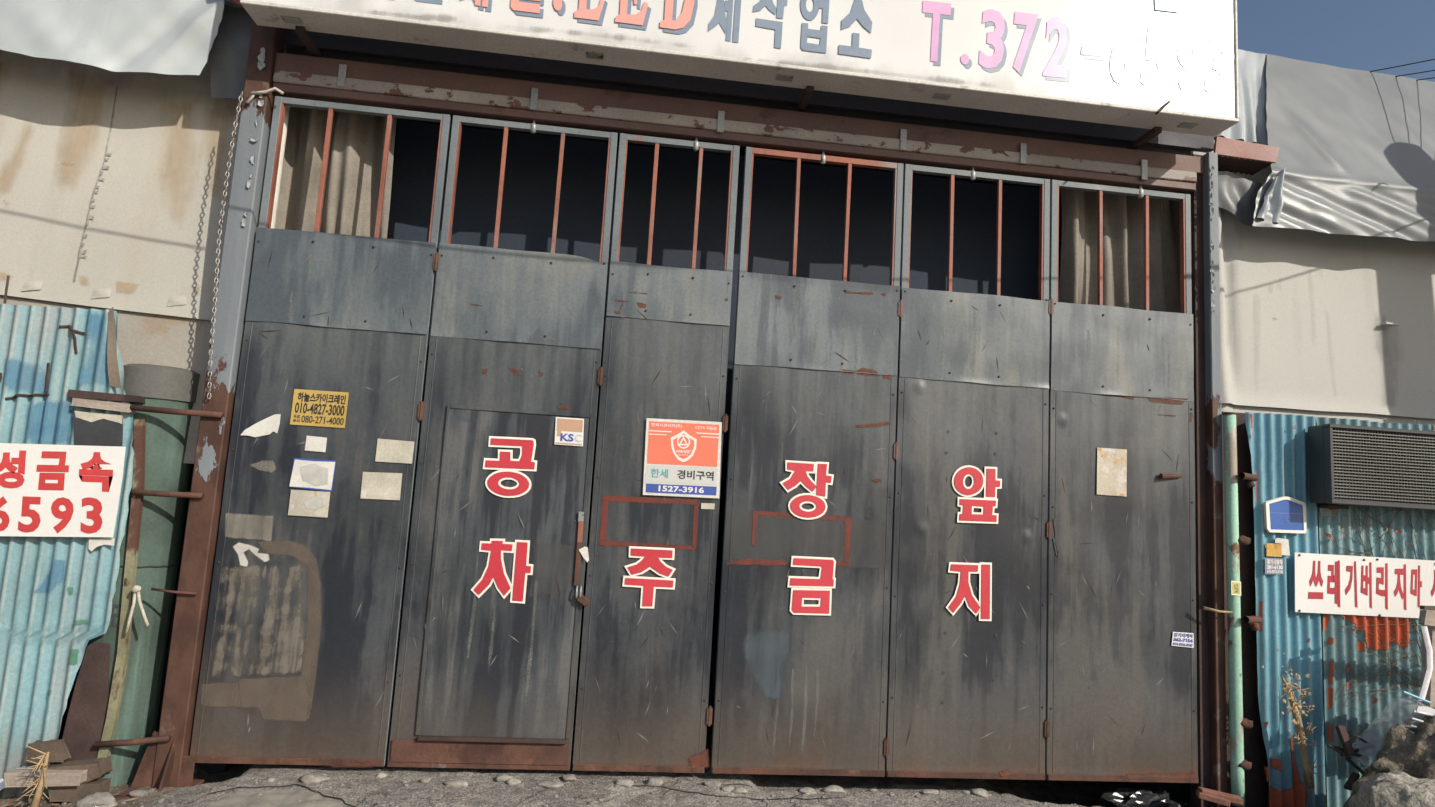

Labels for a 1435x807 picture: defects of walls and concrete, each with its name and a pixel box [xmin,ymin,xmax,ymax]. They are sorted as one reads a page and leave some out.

peeling [1307,616,1409,652]
peeling [1327,661,1350,742]
peeling [1266,738,1307,807]